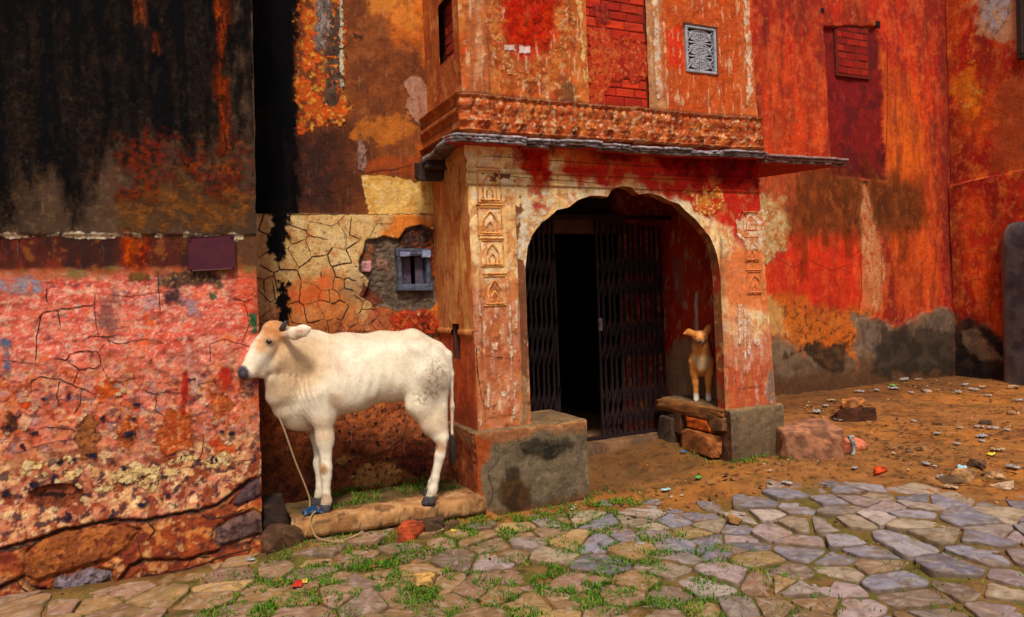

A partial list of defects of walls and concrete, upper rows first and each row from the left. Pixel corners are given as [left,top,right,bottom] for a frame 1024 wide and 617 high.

leakage [0,0,301,261]
crack [3,213,427,454]
leakage [273,280,292,322]
flaking render [357,140,437,315]
leakage [783,168,1004,380]
leakage [520,437,575,459]